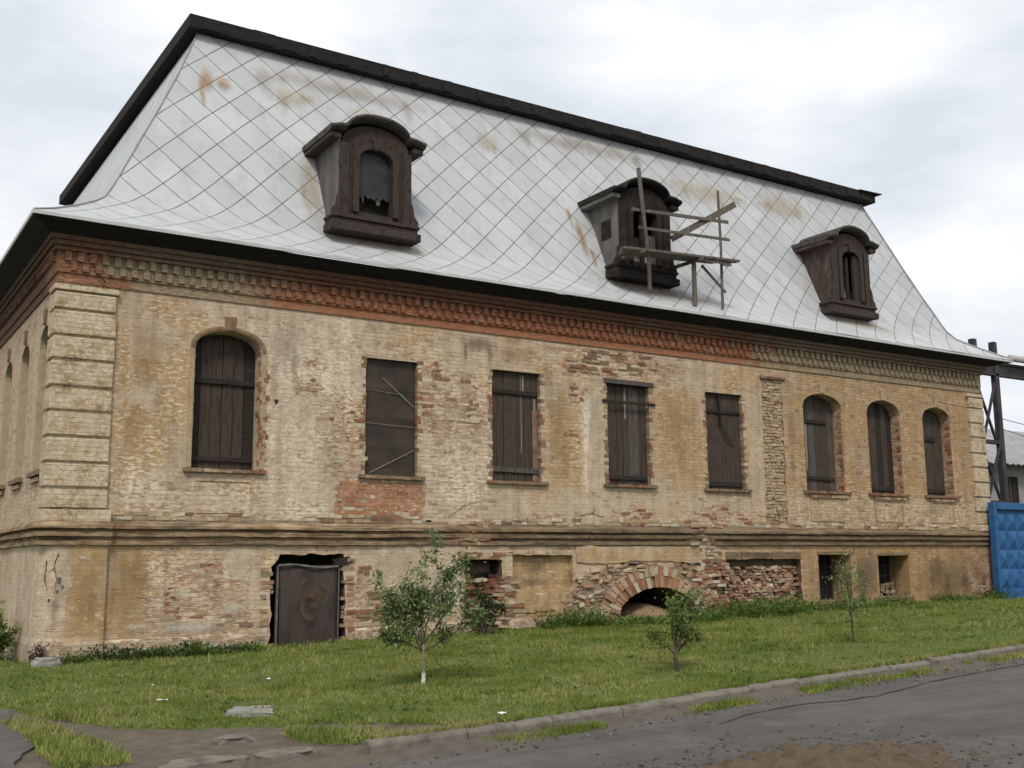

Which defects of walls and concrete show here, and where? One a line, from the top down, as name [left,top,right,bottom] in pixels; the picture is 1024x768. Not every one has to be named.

flaking render [295,356,426,519]
spalling [684,359,788,526]
flaking render [346,545,640,639]
spalling [669,545,803,615]